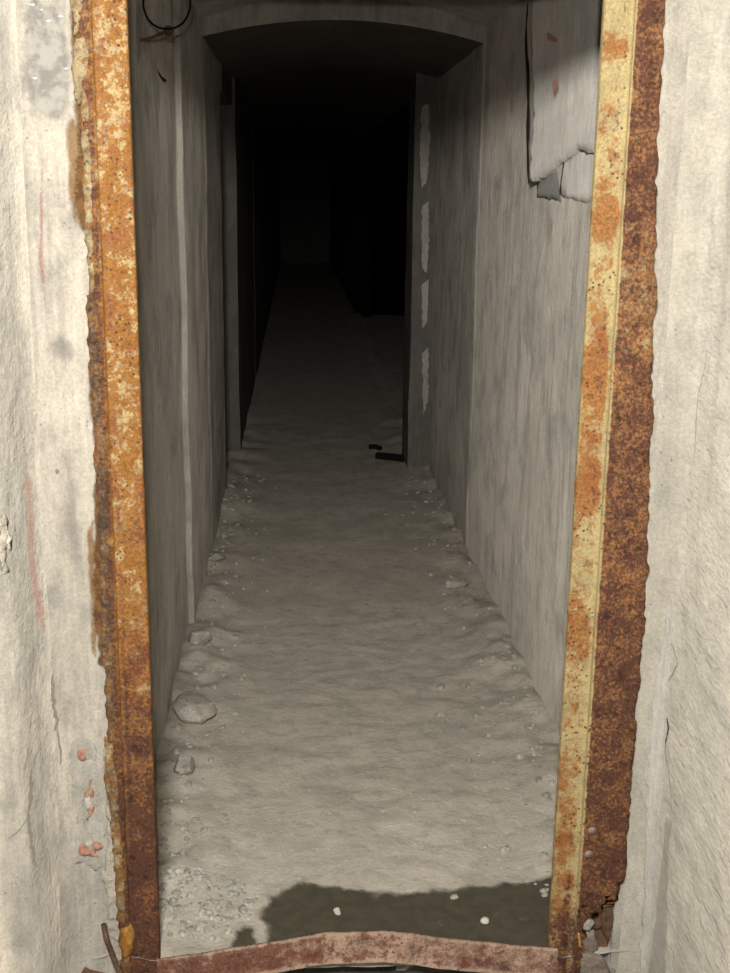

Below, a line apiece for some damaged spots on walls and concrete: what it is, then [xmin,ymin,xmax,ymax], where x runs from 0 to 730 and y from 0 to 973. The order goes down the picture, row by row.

corrosion [68,100,86,231]
corrosion [88,474,104,666]
corrosion [577,906,614,973]